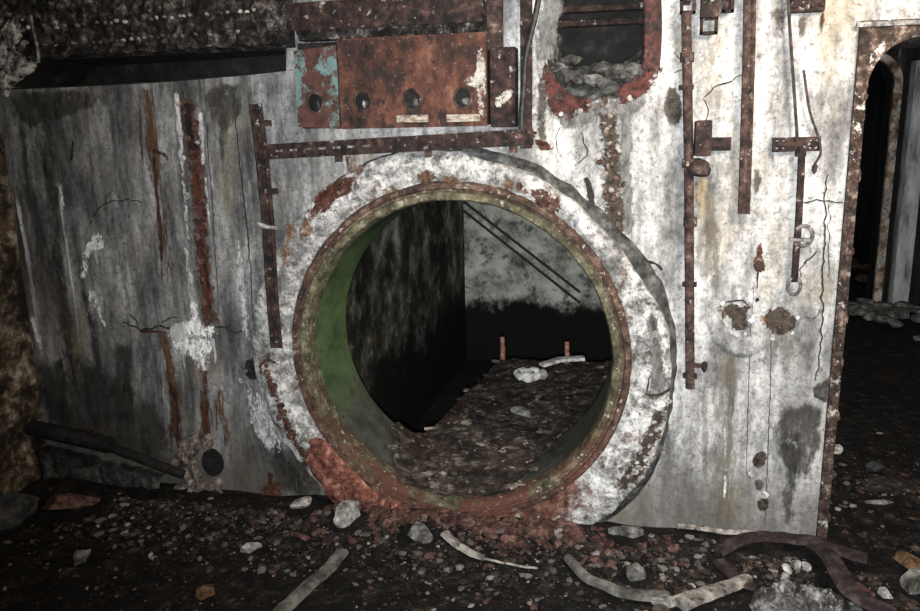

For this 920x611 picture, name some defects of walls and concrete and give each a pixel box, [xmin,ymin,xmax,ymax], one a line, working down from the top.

corrosion [372,20,489,37]
corrosion [139,88,173,279]
water stain [168,299,217,371]
crack [799,174,843,381]
corrosion [307,438,399,510]
water stain [775,404,821,523]